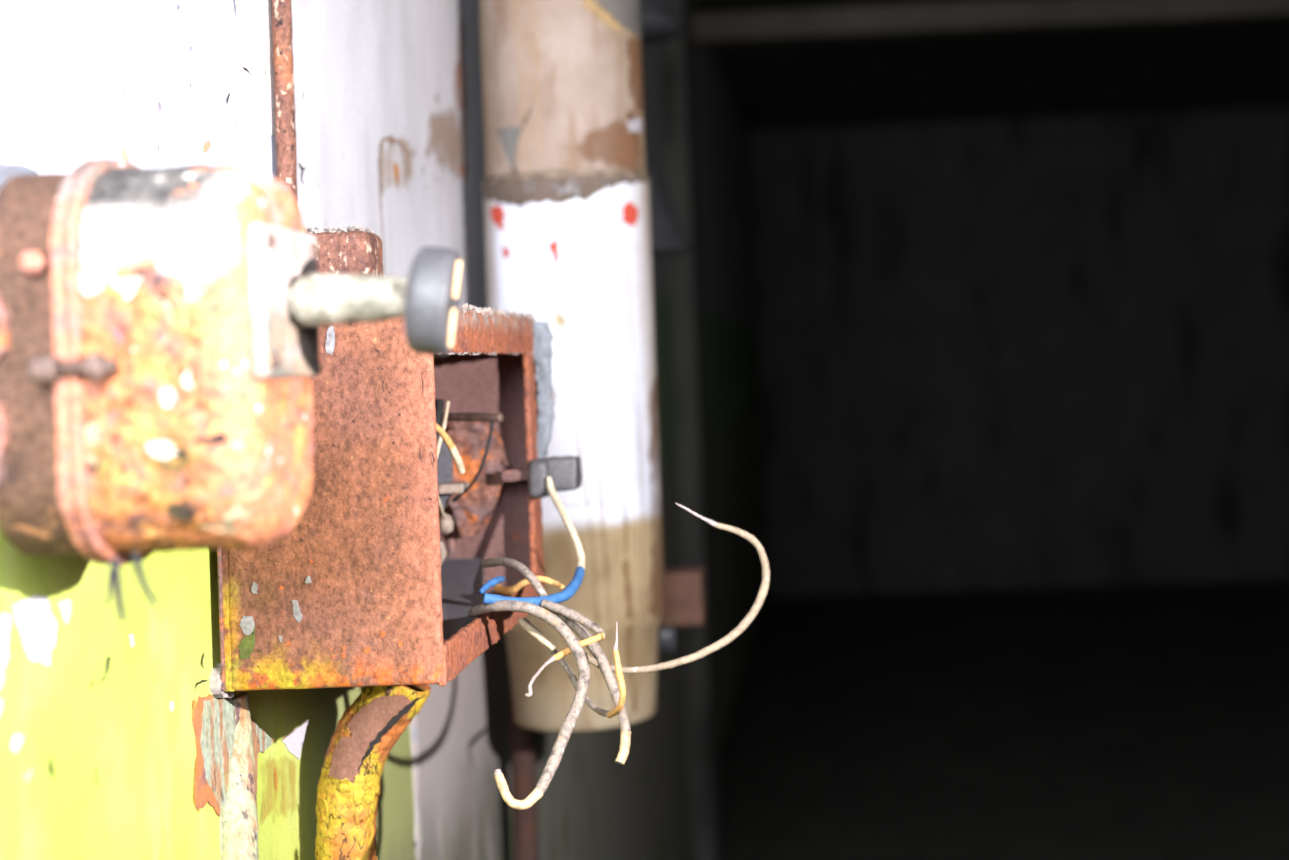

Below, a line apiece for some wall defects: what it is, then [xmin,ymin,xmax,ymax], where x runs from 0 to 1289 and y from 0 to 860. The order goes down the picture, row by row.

peeling [209,0,276,147]
peeling [596,0,642,42]
spalling [498,105,532,181]
peeling [0,595,71,713]
spalling [200,698,235,860]
spalling [251,717,309,795]